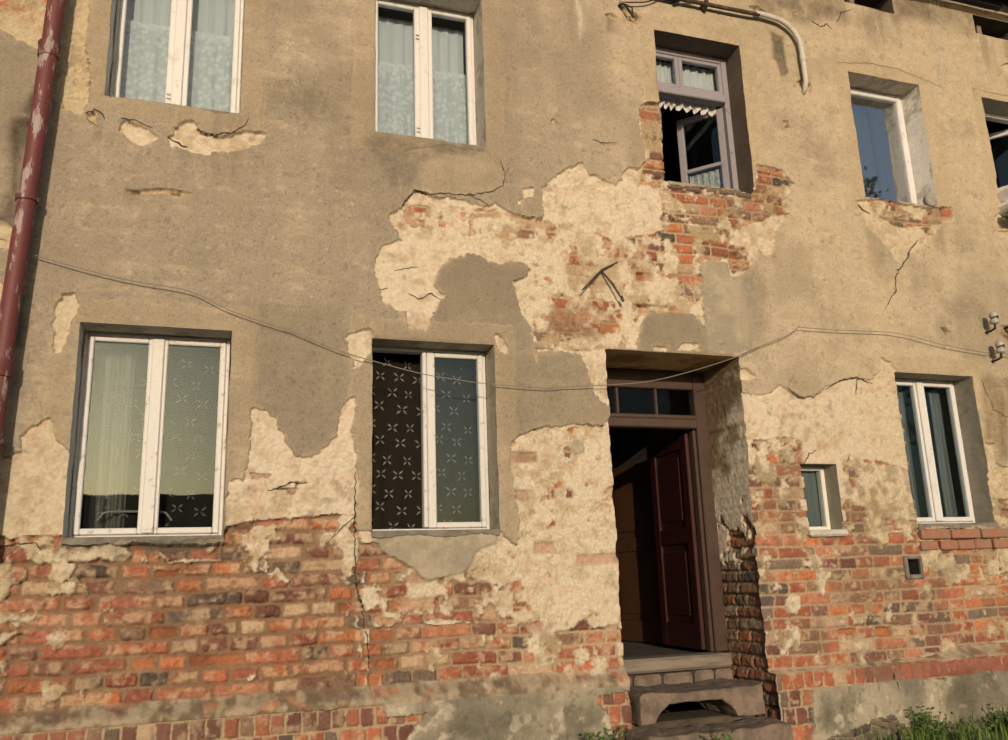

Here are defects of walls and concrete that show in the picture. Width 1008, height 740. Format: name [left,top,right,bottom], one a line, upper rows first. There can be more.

flaking render [0,0,47,49]
flaking render [53,0,98,126]
flaking render [119,119,267,155]
flaking render [374,101,795,406]
crack [885,240,918,310]
flaking render [855,198,954,263]
flaking render [346,328,374,369]
crack [788,377,872,398]
flaking render [0,396,624,740]
crack [329,472,370,688]
flaking render [741,357,1008,740]
peeling [598,690,632,740]